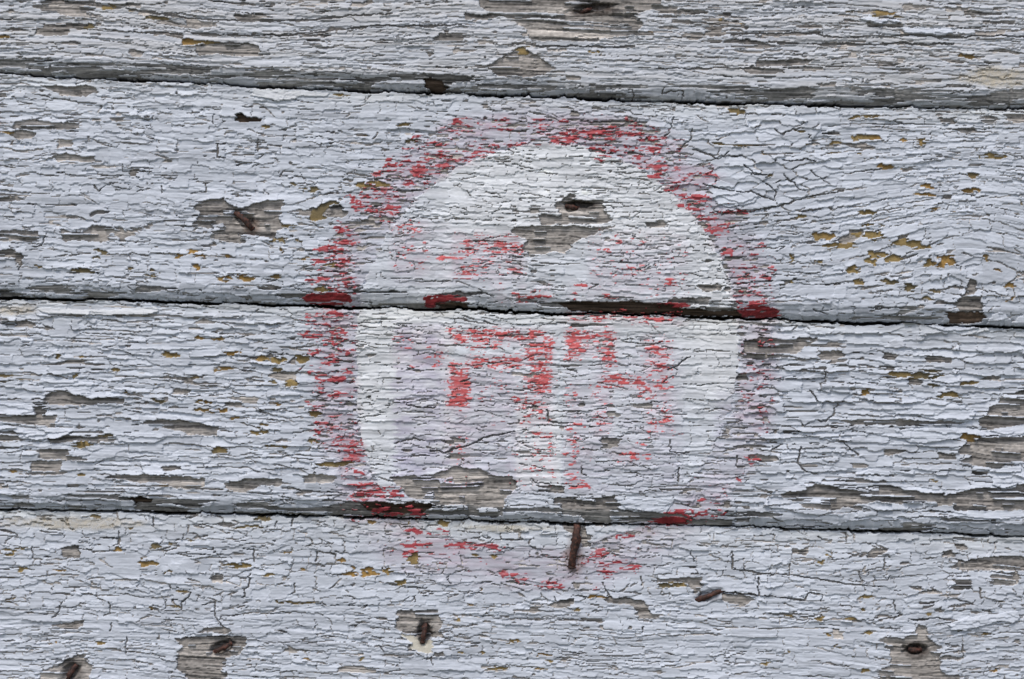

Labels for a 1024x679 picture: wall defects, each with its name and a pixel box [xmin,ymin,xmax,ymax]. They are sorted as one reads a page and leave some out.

peeling [465,0,663,77]
crack [617,90,637,128]
crack [655,66,845,215]
peeling [192,198,302,253]
peeling [511,194,612,257]
peeling [560,284,741,318]
peeling [0,374,239,476]
peeling [781,370,1024,520]
crack [242,548,255,598]
crack [724,551,896,611]
crack [103,602,128,653]
crack [213,602,226,629]